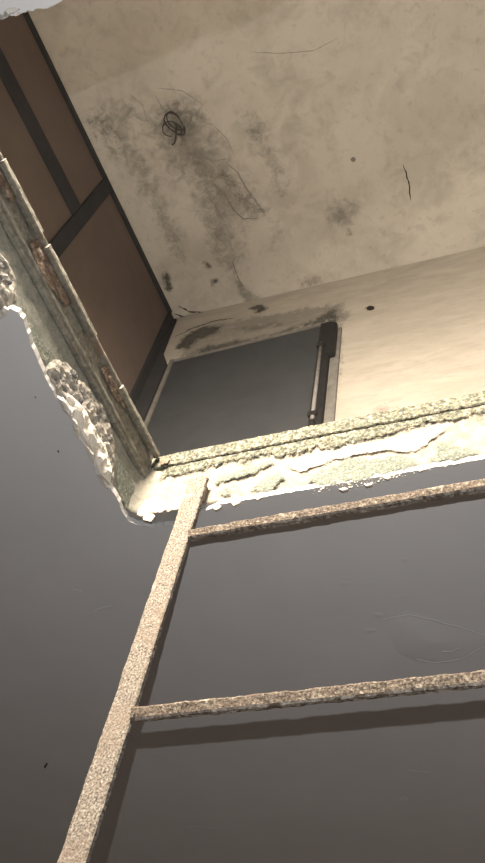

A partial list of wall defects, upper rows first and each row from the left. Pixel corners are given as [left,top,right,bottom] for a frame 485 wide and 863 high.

spalling [0,253,180,522]